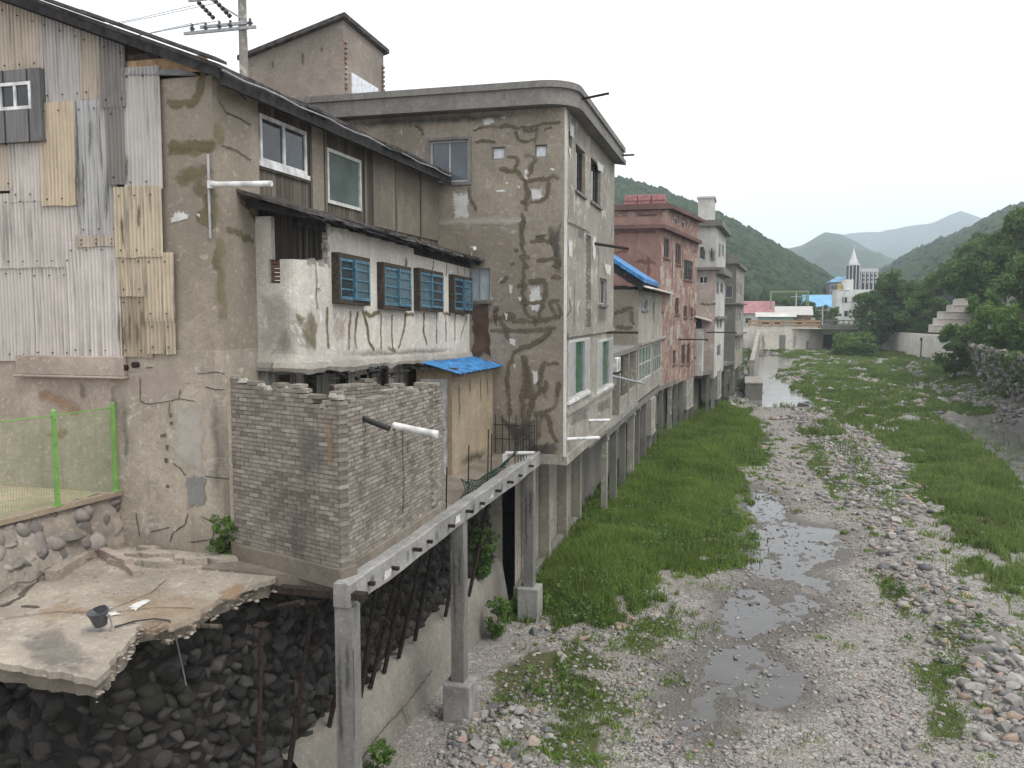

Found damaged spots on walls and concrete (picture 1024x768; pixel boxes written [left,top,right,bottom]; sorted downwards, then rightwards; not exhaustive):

crack [220,94,251,125]
leakage [168,125,225,151]
flaking render [170,211,200,223]
leakage [194,182,217,221]
crack [467,188,477,211]
peeling [439,191,528,225]
crack [472,121,656,443]
crack [139,367,225,409]
flaking render [186,475,206,507]
crack [136,513,215,543]
crack [0,573,67,618]
crack [109,579,188,612]